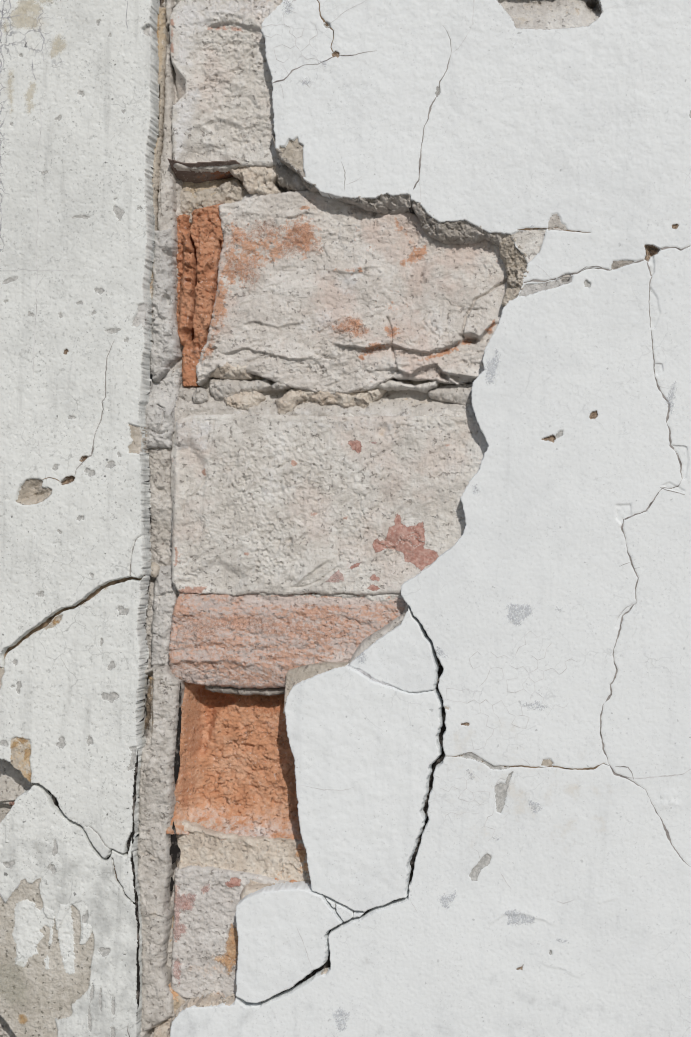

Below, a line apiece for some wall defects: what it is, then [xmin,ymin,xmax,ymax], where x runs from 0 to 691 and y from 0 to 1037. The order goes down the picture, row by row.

crack [264,0,372,98]
spalling [498,0,604,30]
spalling [271,134,591,307]
crack [4,535,145,658]
spalling [283,603,409,714]
crack [261,246,691,1002]
spalling [0,737,32,782]
crack [38,783,62,811]
peeling [458,753,513,813]
peeling [0,840,116,1037]
crack [86,751,140,1037]
peeling [469,854,491,881]